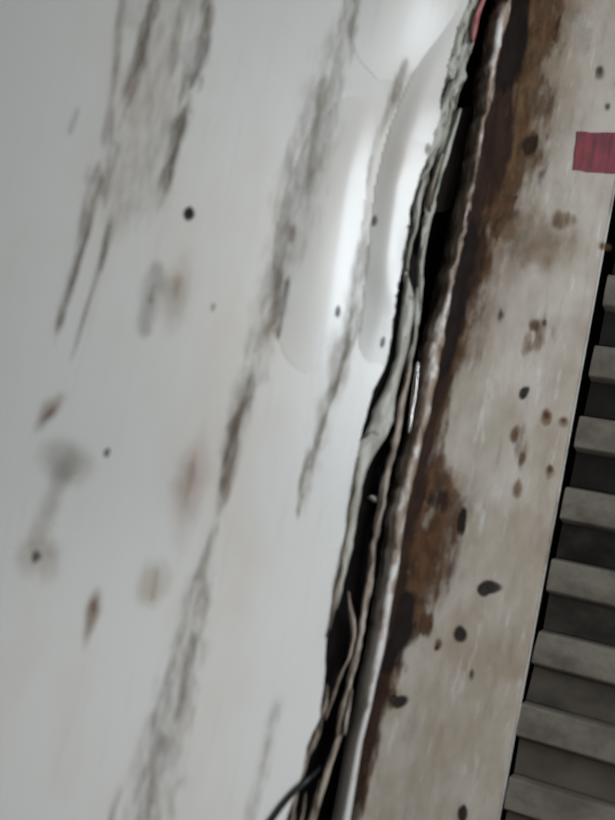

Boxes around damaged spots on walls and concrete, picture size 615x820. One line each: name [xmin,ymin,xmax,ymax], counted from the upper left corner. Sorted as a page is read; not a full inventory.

damp [184,207,194,220]
corrosion [554,212,569,227]
peeling [286,0,485,820]
corrosion [350,0,563,820]
corrosion [543,410,567,425]
spalling [478,581,501,596]